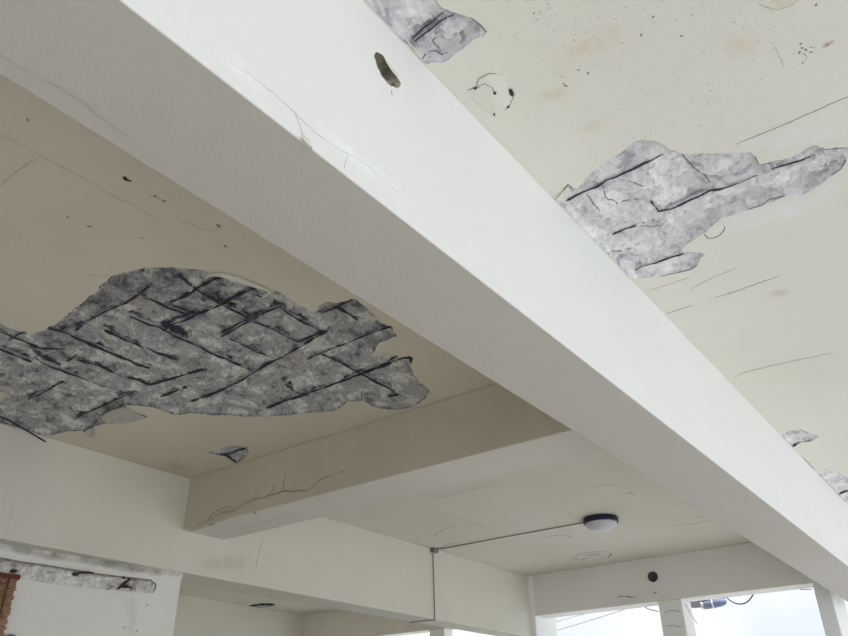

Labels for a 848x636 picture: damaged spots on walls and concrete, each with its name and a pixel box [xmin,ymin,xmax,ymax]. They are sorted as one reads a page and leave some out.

spalling [365,0,487,64]
spalling [374,52,401,88]
spalling [556,129,848,279]
spalling [0,267,429,442]
spalling [208,445,249,463]
spalling [783,429,819,447]
spalling [803,458,848,502]
crack [194,469,349,565]